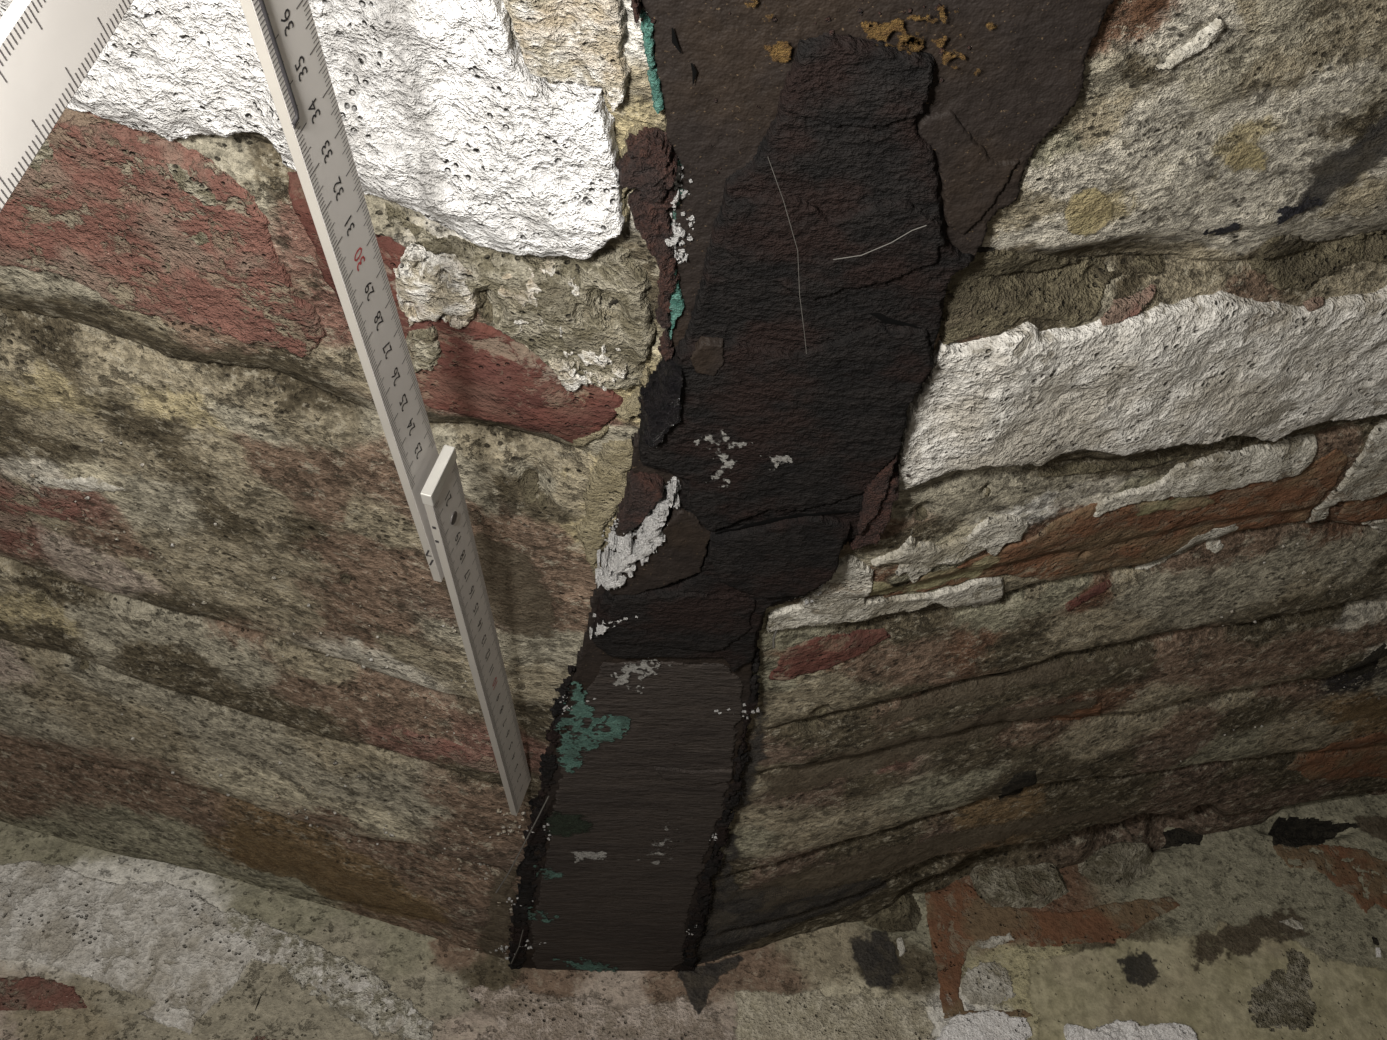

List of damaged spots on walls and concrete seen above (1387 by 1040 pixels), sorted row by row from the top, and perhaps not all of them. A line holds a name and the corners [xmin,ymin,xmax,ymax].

peeling [723,109,1019,301]
spalling [1248,230,1387,312]
spalling [520,467,539,504]
water stain [595,476,680,591]
water stain [694,430,747,487]
water stain [760,455,793,470]
peeling [603,247,1166,652]
flaking render [883,448,1348,612]
flaking render [1336,492,1387,522]
flaking render [768,628,891,681]